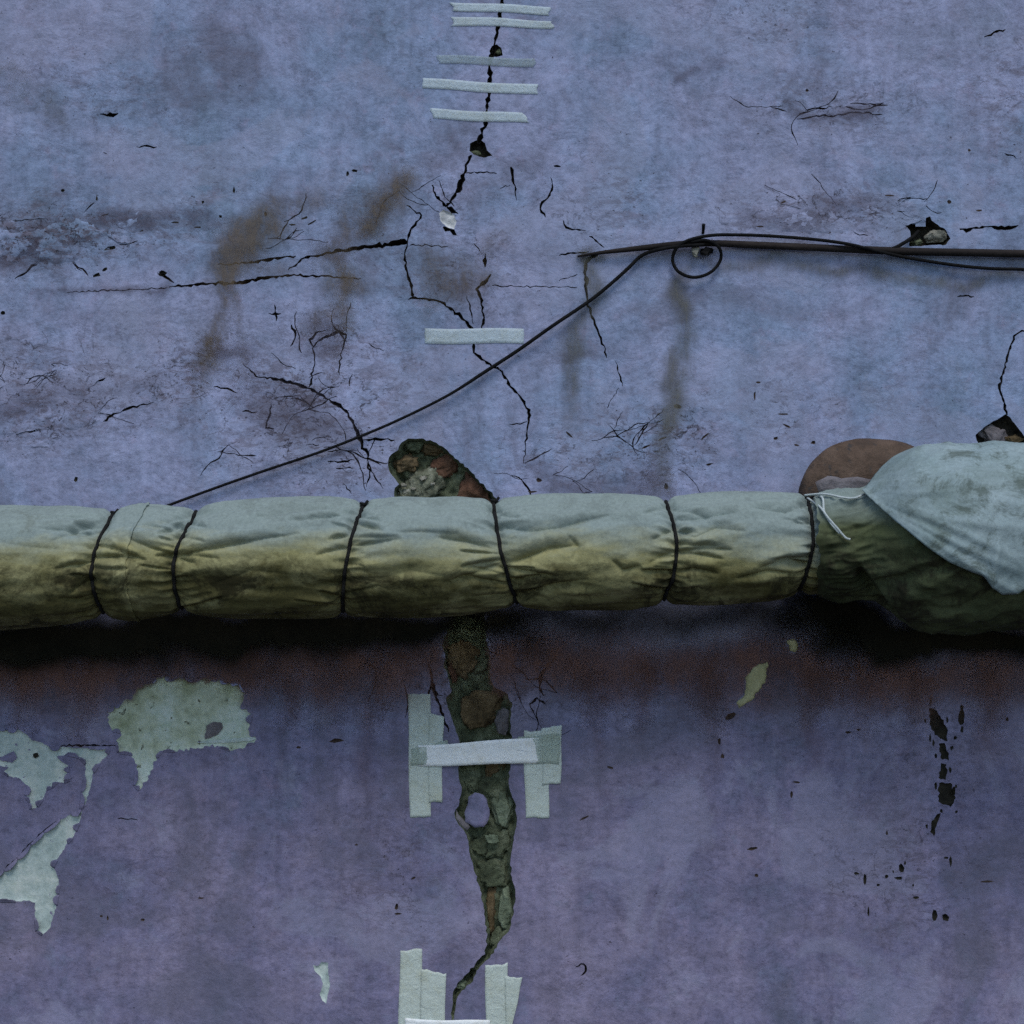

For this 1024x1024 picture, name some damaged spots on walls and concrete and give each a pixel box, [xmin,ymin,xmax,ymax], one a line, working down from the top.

crack [730,91,887,145]
crack [15,262,48,279]
crack [67,0,664,495]
spalling [905,216,950,246]
crack [0,362,68,395]
crack [998,330,1024,415]
spalling [388,438,496,503]
spalling [442,615,512,743]
peeling [725,662,768,720]
peeling [0,676,256,936]
peeling [924,699,965,835]
spalling [451,764,517,1020]